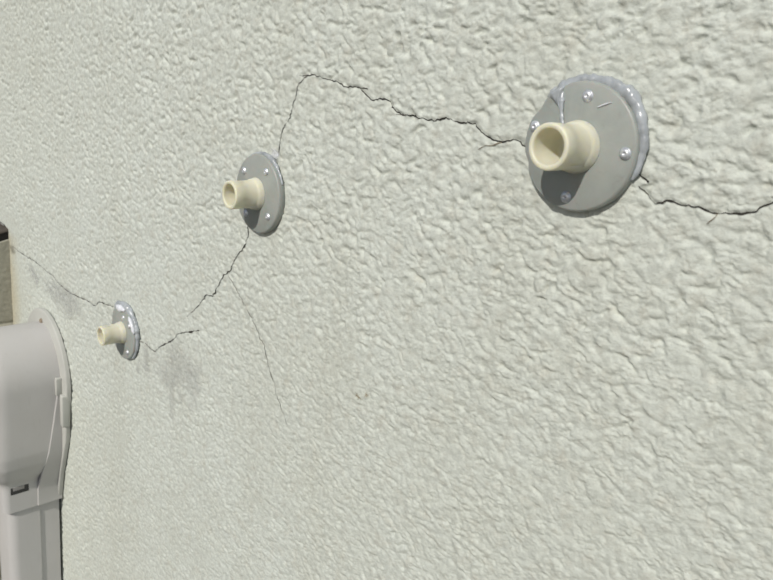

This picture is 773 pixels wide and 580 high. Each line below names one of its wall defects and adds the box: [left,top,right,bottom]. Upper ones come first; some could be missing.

crack [278,74,525,153]
crack [638,174,773,224]
crack [12,246,112,307]
crack [192,227,287,424]